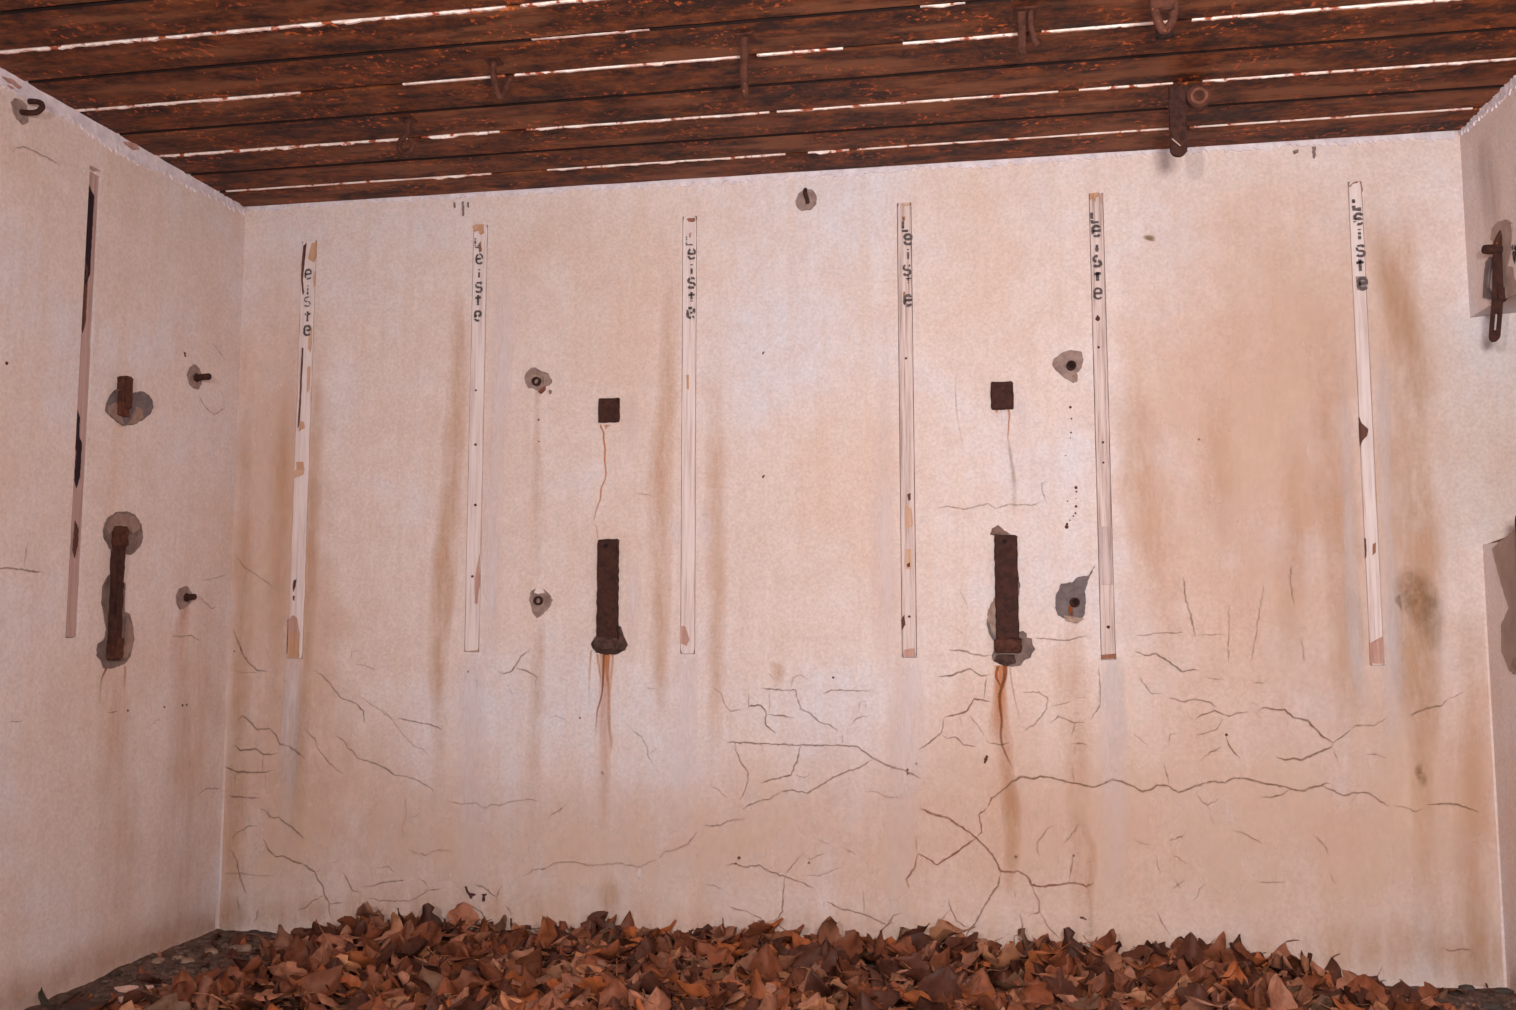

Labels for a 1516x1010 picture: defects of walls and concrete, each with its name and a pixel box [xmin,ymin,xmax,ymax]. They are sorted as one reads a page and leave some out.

corrosion [597,654,609,708]
crack [734,650,985,807]
corrosion [995,665,1007,749]
crack [907,709,1339,928]